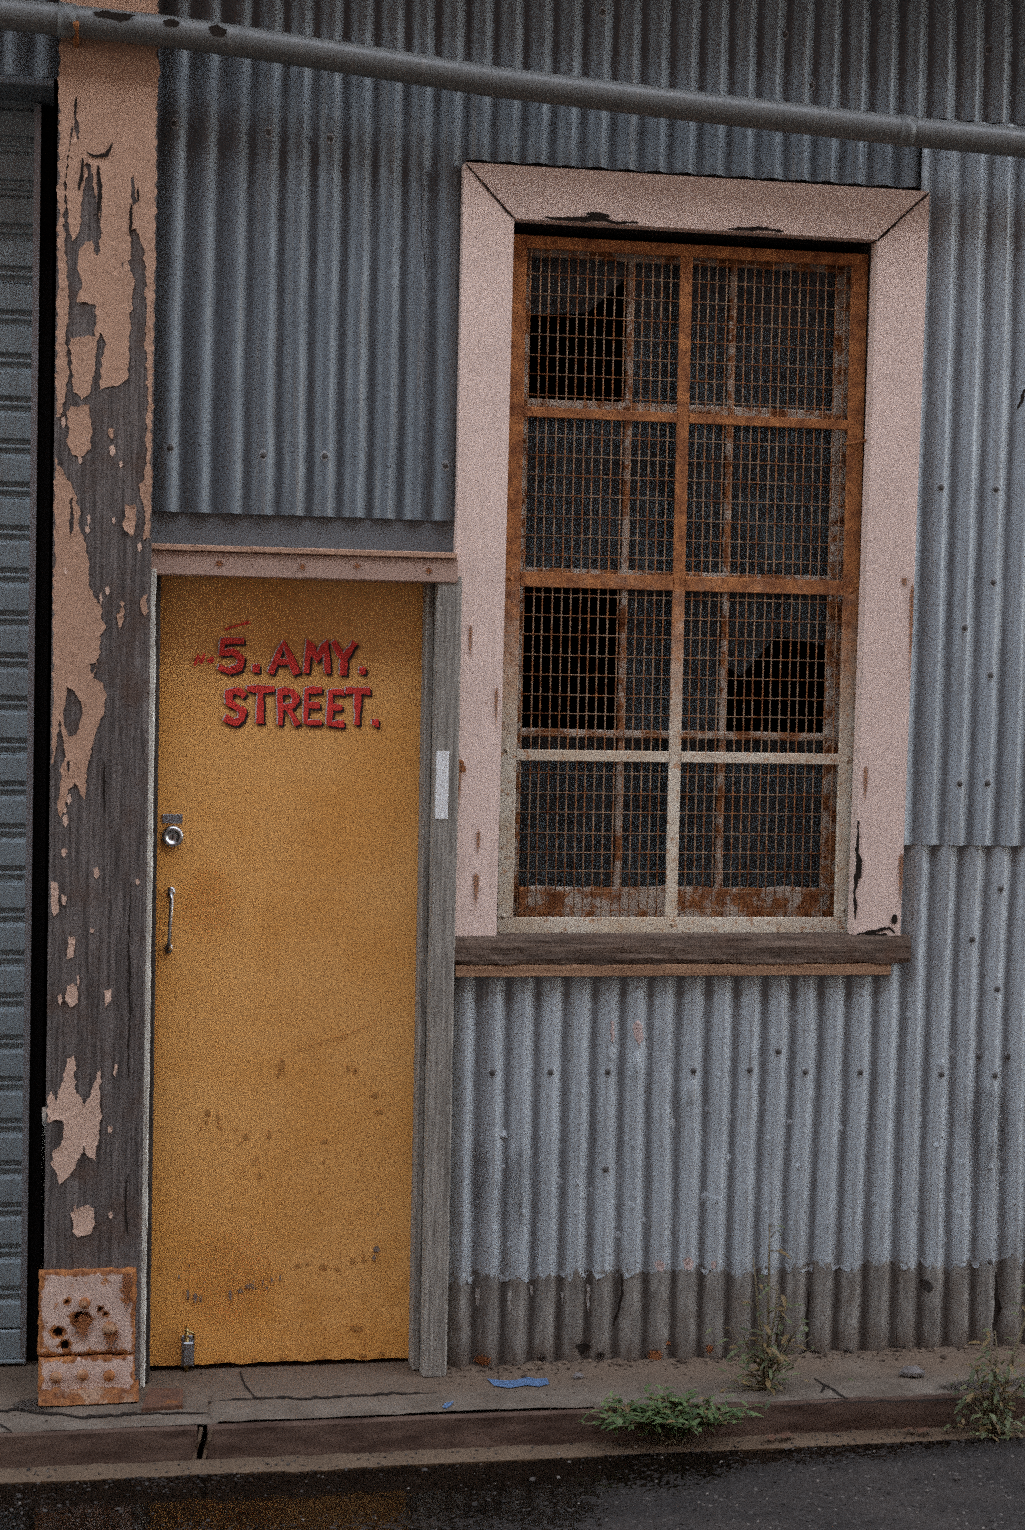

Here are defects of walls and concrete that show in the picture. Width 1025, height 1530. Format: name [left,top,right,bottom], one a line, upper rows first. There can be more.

peeling [60,0,181,27]
peeling [208,25,227,36]
peeling [51,38,160,827]
peeling [51,881,67,917]
peeling [58,928,94,1007]
peeling [46,1055,118,1184]
peeling [70,1204,113,1237]
rust [123,1273,131,1307]
rust [75,1315,118,1348]